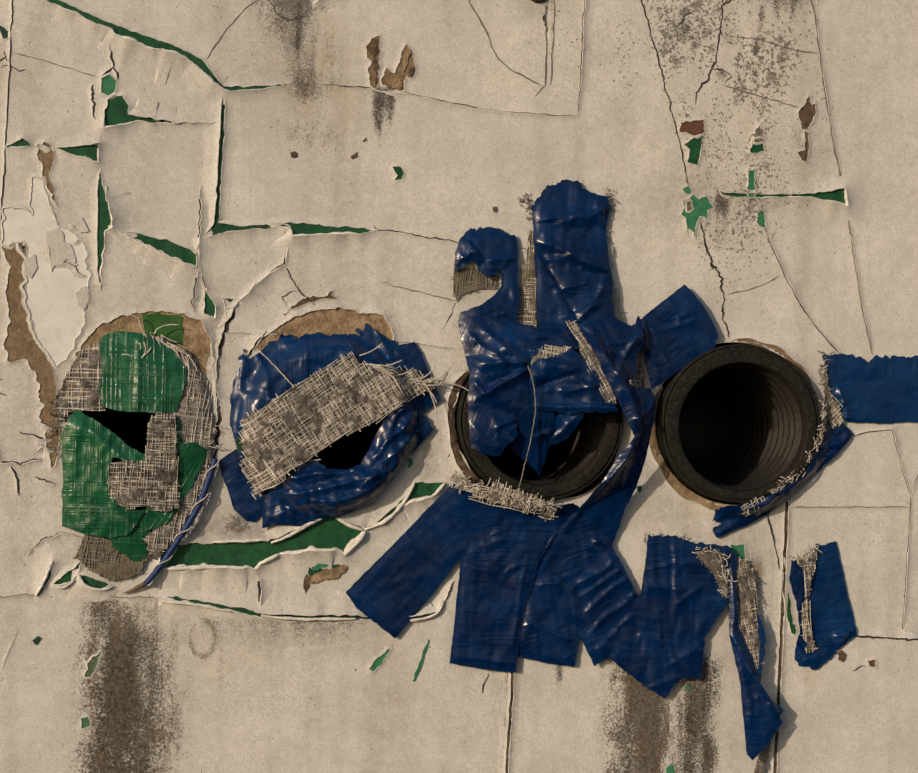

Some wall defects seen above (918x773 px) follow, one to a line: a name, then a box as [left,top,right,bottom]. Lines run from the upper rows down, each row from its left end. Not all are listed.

water stain [253,0,317,100]
crack [320,0,595,123]
crack [695,0,843,176]
peeling [0,0,379,474]
peeling [250,286,403,354]
water stain [715,190,729,242]
crack [700,222,842,354]
peeling [675,115,869,241]
peeling [146,369,489,627]
crack [793,424,918,641]
water stain [76,601,179,773]
water stain [603,656,722,773]